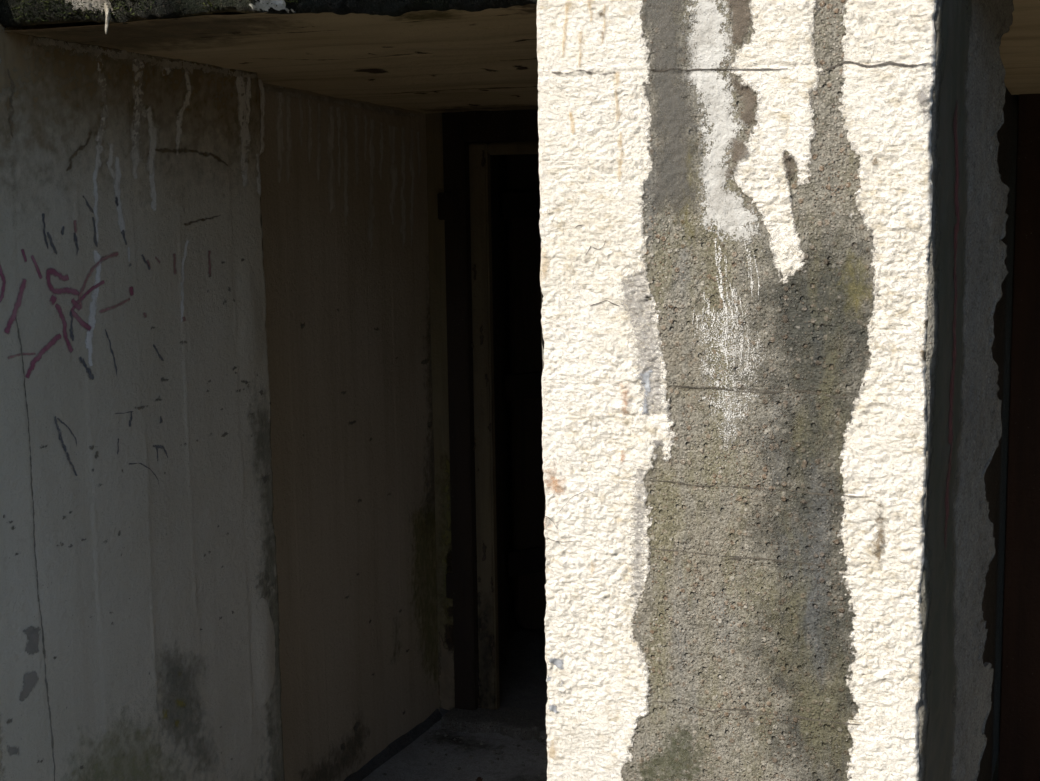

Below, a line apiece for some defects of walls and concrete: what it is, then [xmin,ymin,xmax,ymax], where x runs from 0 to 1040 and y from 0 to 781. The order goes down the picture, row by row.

crack [647,66,788,74]
crack [825,61,929,70]
crack [67,133,91,171]
crack [155,148,228,166]
damp [0,0,422,366]
peeling [621,0,881,781]
spalling [874,505,885,570]